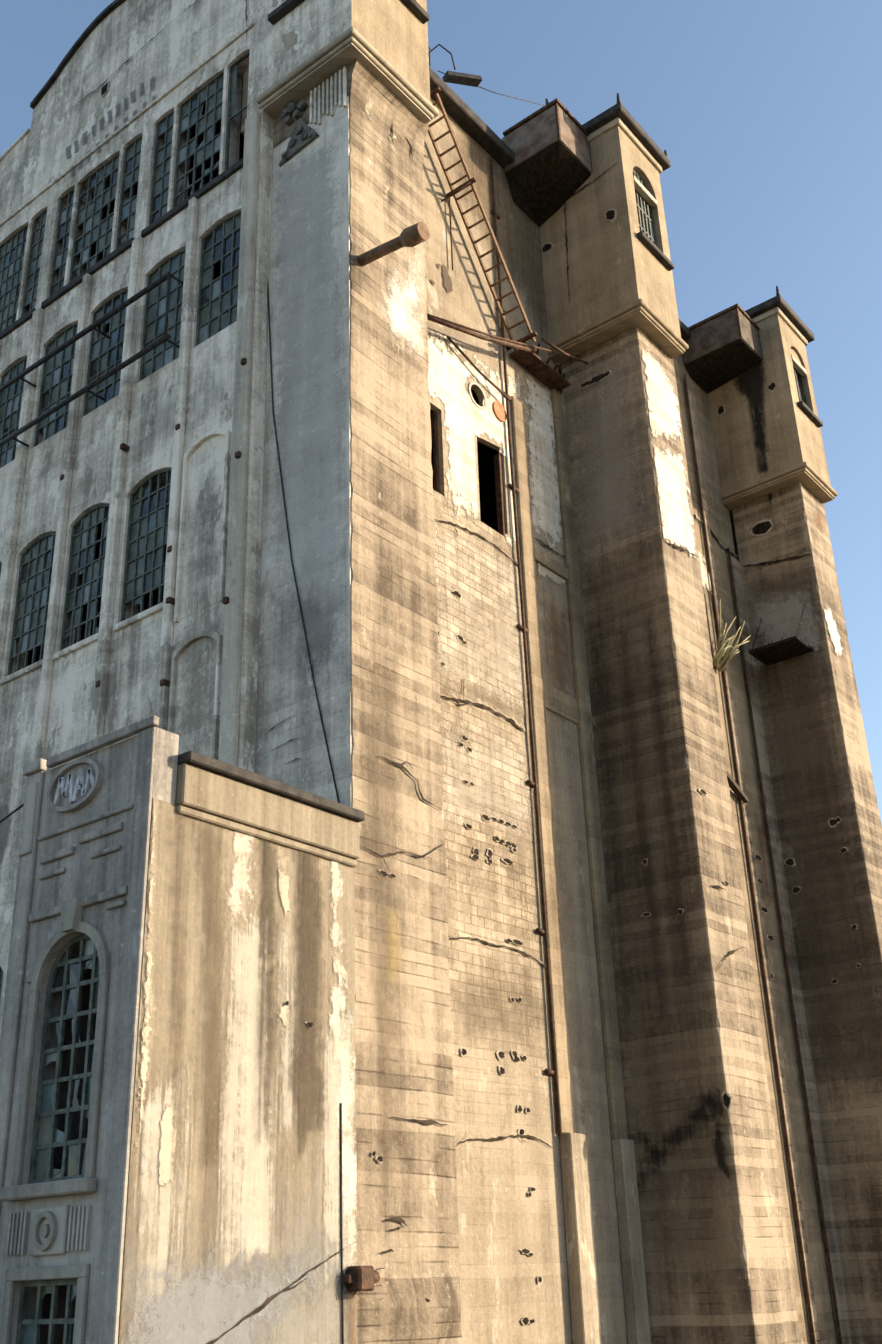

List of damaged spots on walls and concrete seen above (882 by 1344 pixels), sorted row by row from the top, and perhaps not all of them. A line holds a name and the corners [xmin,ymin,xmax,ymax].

spalling [604,209,617,223]
peeling [384,264,567,705]
peeling [641,344,713,599]
crack [440,679,527,733]
crack [359,844,444,869]
crack [374,755,443,811]
peeling [440,721,534,865]
damp [125,1075,188,1319]
damp [199,827,354,1344]
crack [389,1117,553,1148]
damp [637,1090,729,1185]
crack [206,1217,407,1344]